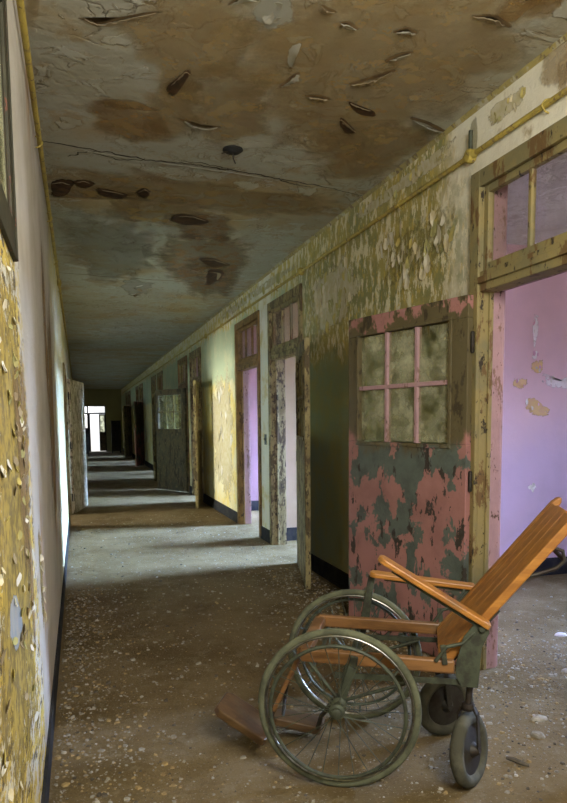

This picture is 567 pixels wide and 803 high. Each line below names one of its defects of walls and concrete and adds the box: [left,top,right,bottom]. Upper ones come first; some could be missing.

peeling [473,14,512,28]
spalling [167,70,190,96]
peeling [280,43,302,87]
leakage [91,0,562,177]
spalling [349,102,375,116]
peeling [489,87,526,125]
leakage [66,173,318,296]
peeling [531,315,567,389]
peeling [526,398,550,416]
peeling [0,247,47,803]